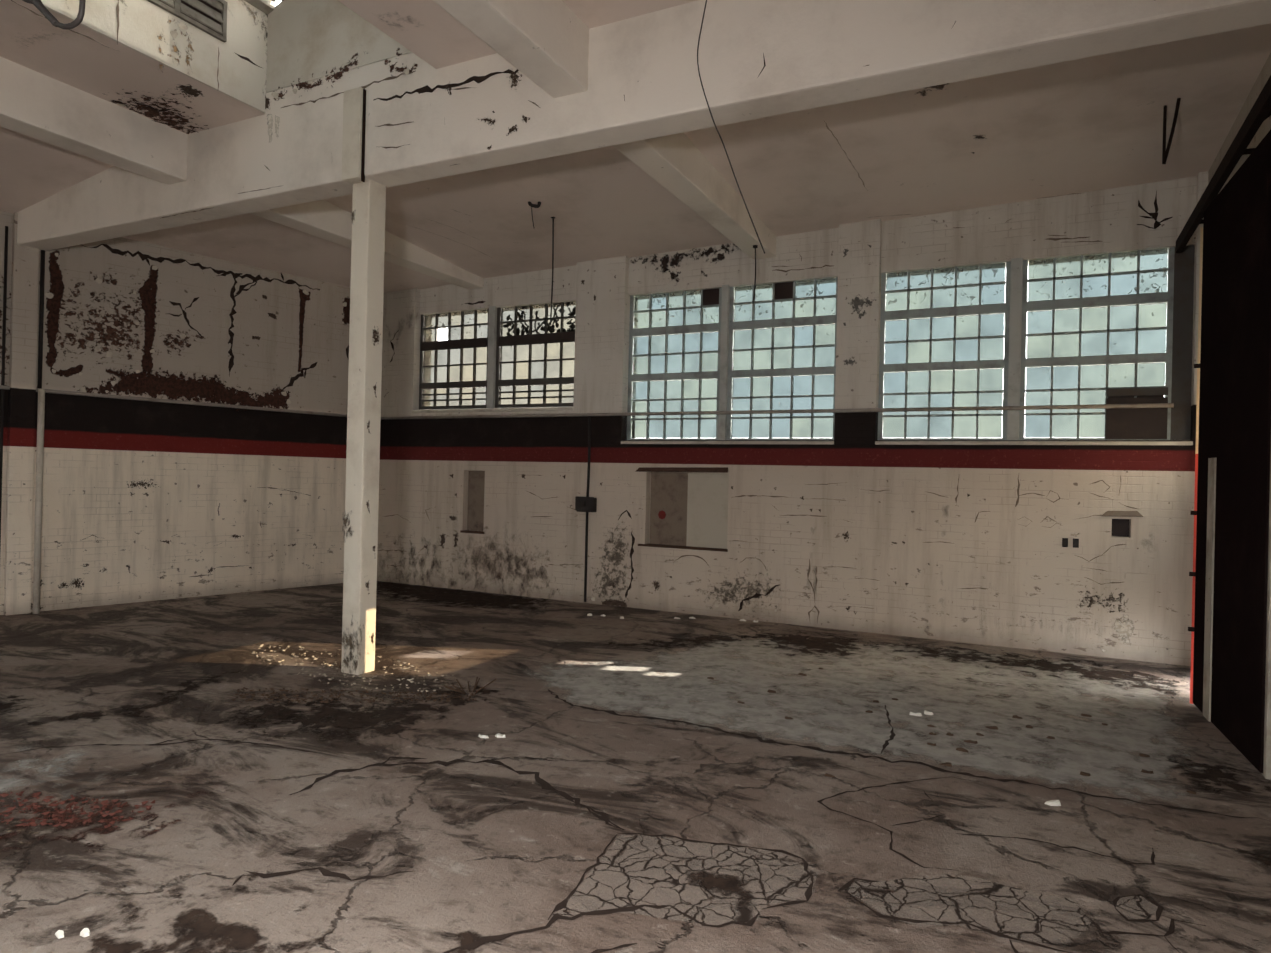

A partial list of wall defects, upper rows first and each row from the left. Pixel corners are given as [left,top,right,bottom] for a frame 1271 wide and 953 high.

flaking render [104,84,209,134]
crack [373,69,540,149]
flaking render [45,250,291,412]
flaking render [298,288,310,372]
damp [376,582,562,610]
crack [0,689,1269,953]